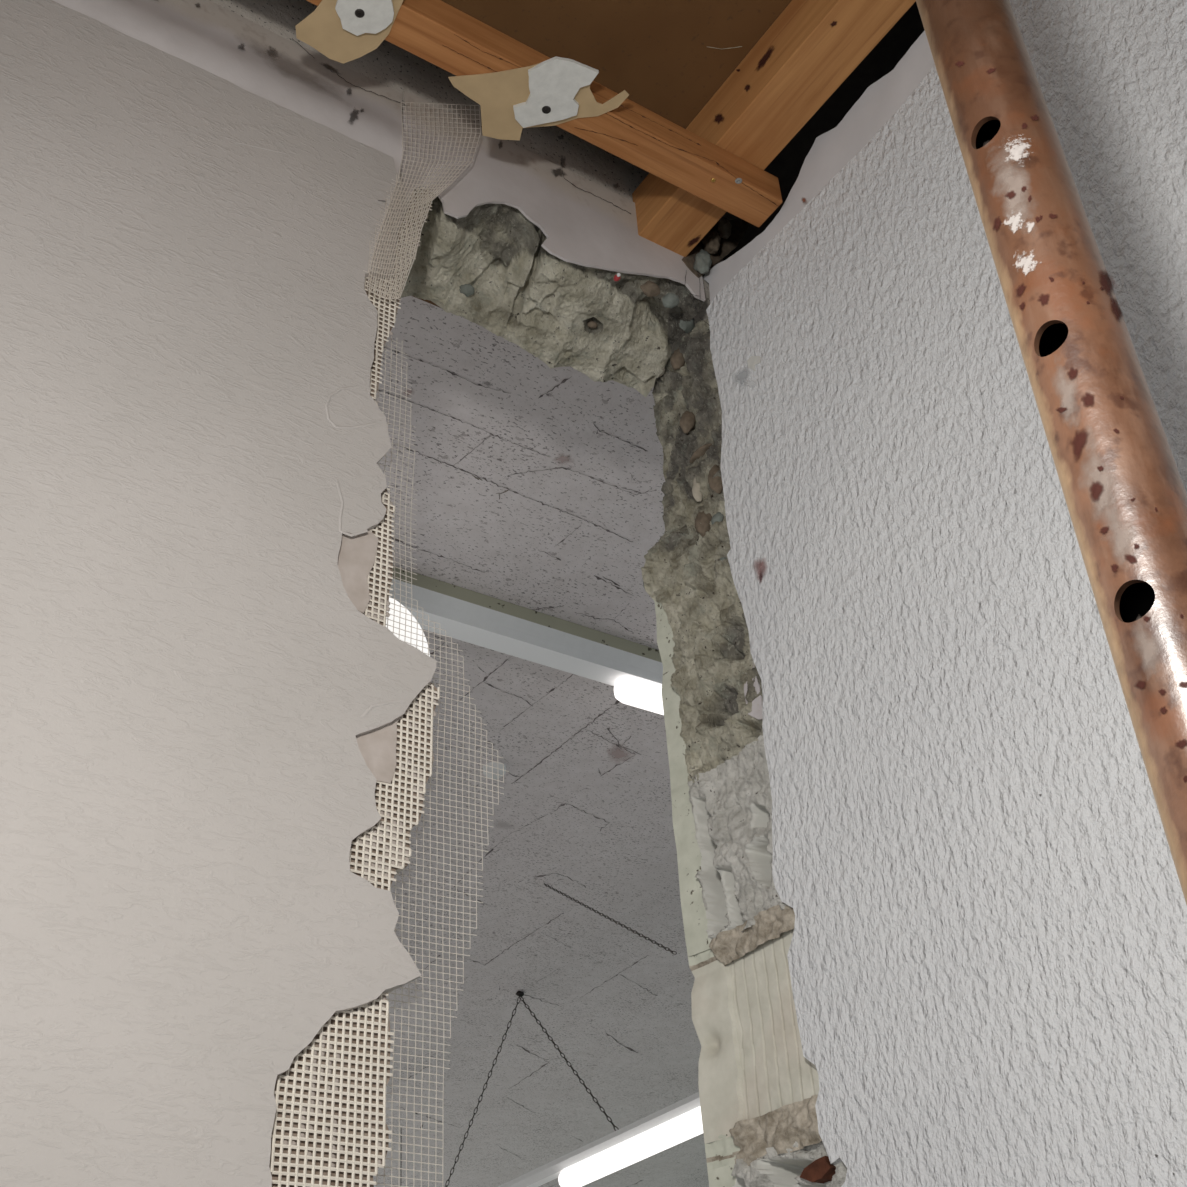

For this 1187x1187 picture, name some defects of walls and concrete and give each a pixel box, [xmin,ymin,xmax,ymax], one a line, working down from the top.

flaking render [682,220,751,278]
flaking render [363,176,433,399]
rust [1100,271,1122,320]
rust [1082,393,1094,406]
rust [1071,432,1087,459]
rust [1090,466,1103,500]
flaking render [338,488,395,627]
rust [1111,544,1139,572]
flaking render [744,661,763,720]
flaking render [349,682,440,891]
flaking render [269,992,394,1187]